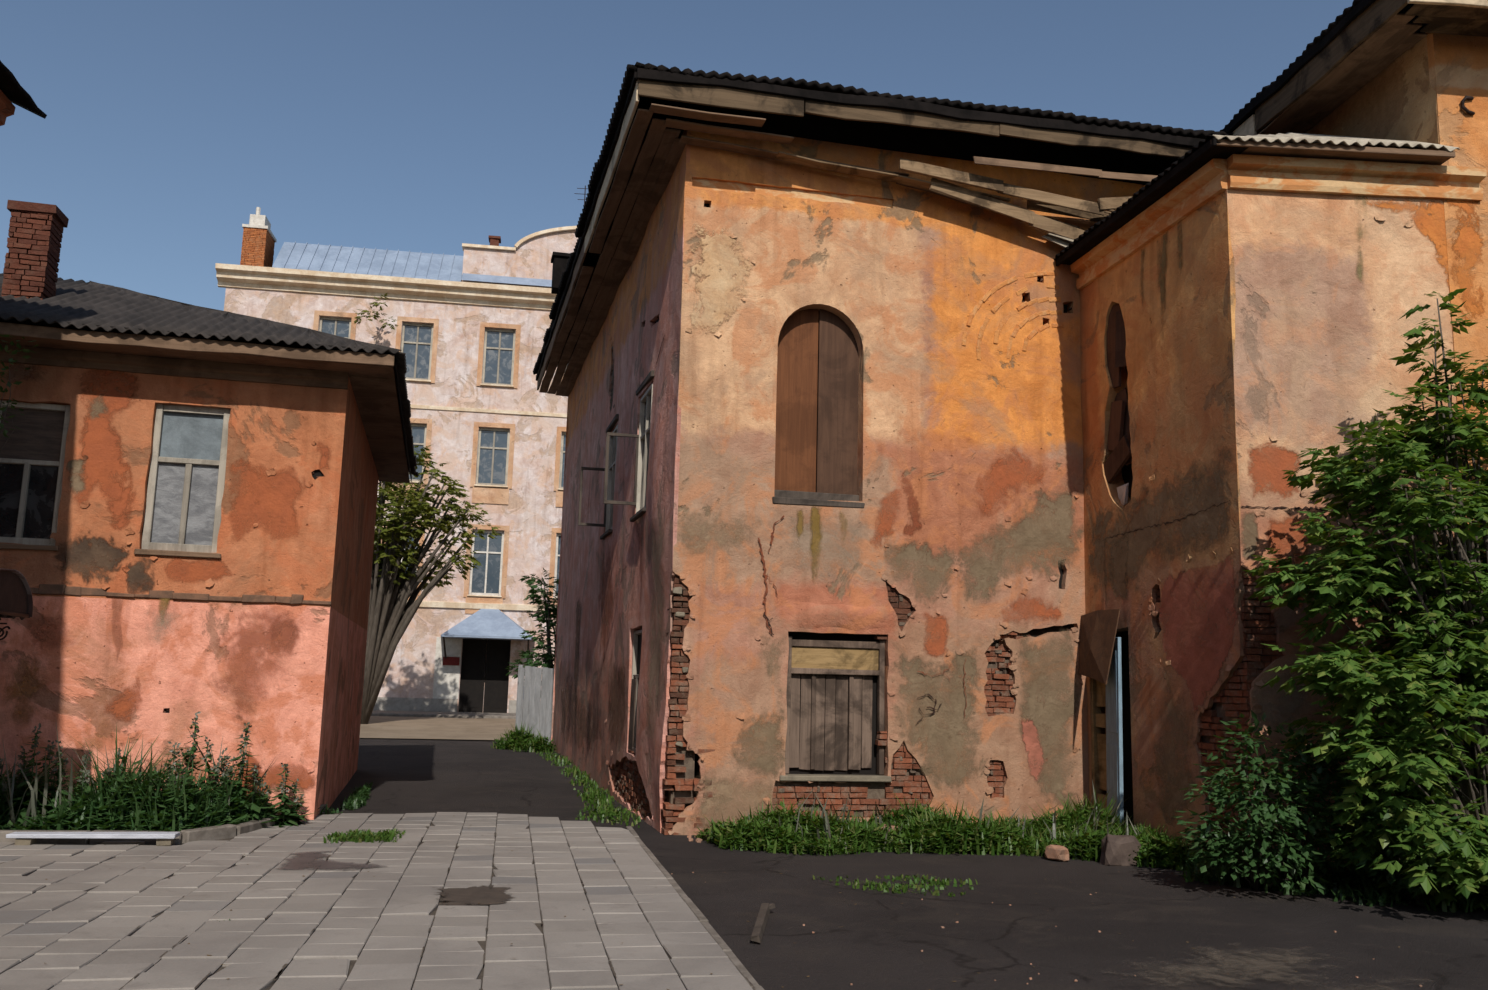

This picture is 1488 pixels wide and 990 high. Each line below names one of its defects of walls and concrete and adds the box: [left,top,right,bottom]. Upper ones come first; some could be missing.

peeling [1368,181,1484,323]
peeling [67,370,137,535]
spalling [1117,483,1129,505]
spalling [606,574,715,843]
crack [758,515,784,635]
peeling [734,475,1084,822]
crack [1002,624,1074,637]
crack [1056,560,1064,589]
spalling [1147,588,1162,634]
spalling [1187,436,1315,841]